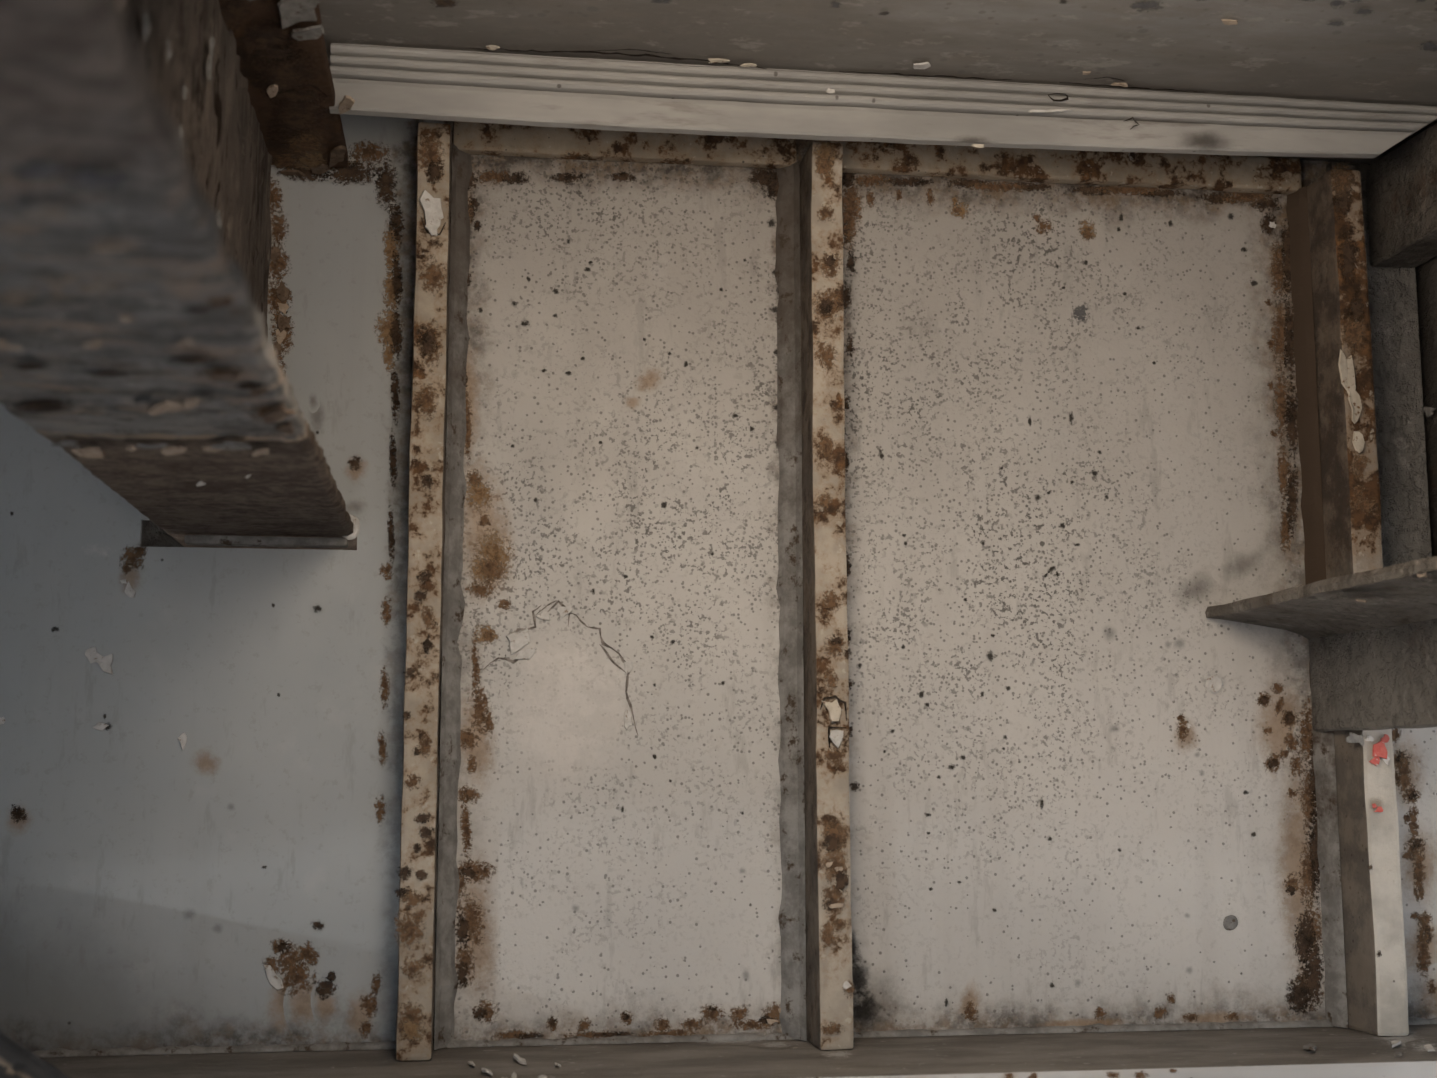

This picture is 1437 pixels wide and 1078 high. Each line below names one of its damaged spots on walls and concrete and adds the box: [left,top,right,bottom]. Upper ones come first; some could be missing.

peeling [206,0,328,157]
corrosion [468,169,531,232]
corrosion [267,137,447,489]
corrosion [379,505,395,625]
corrosion [414,570,435,654]
corrosion [455,327,781,1040]
corrosion [823,630,855,690]
corrosion [394,812,435,978]
corrosion [820,819,850,948]
corrosion [1248,666,1325,1021]
corrosion [1392,728,1437,1019]
corrosion [263,922,382,1043]